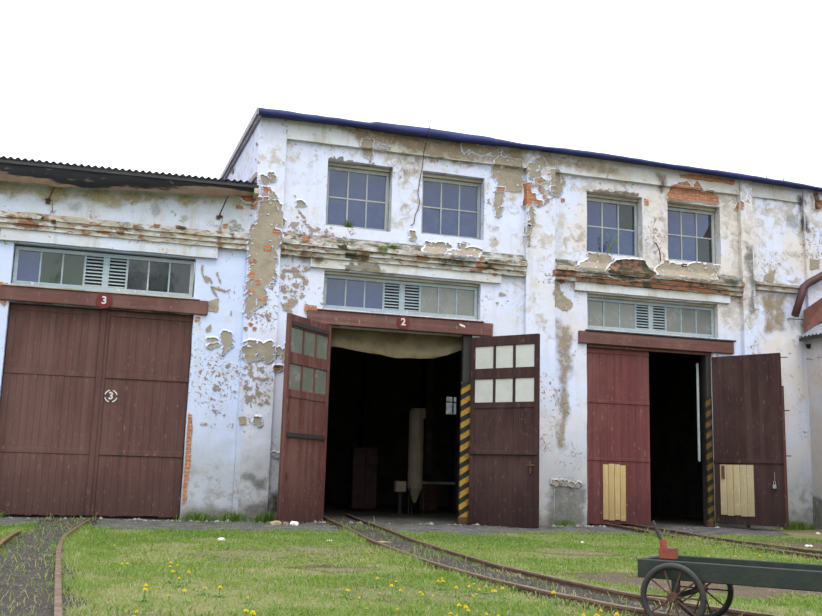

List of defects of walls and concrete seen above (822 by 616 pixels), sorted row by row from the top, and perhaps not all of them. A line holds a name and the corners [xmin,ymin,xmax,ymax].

flaking render [7,215,56,228]
peeling [408,229,498,276]
peeling [460,143,567,254]
flaking render [665,174,735,205]
peeling [205,170,370,428]
flaking render [182,413,215,504]